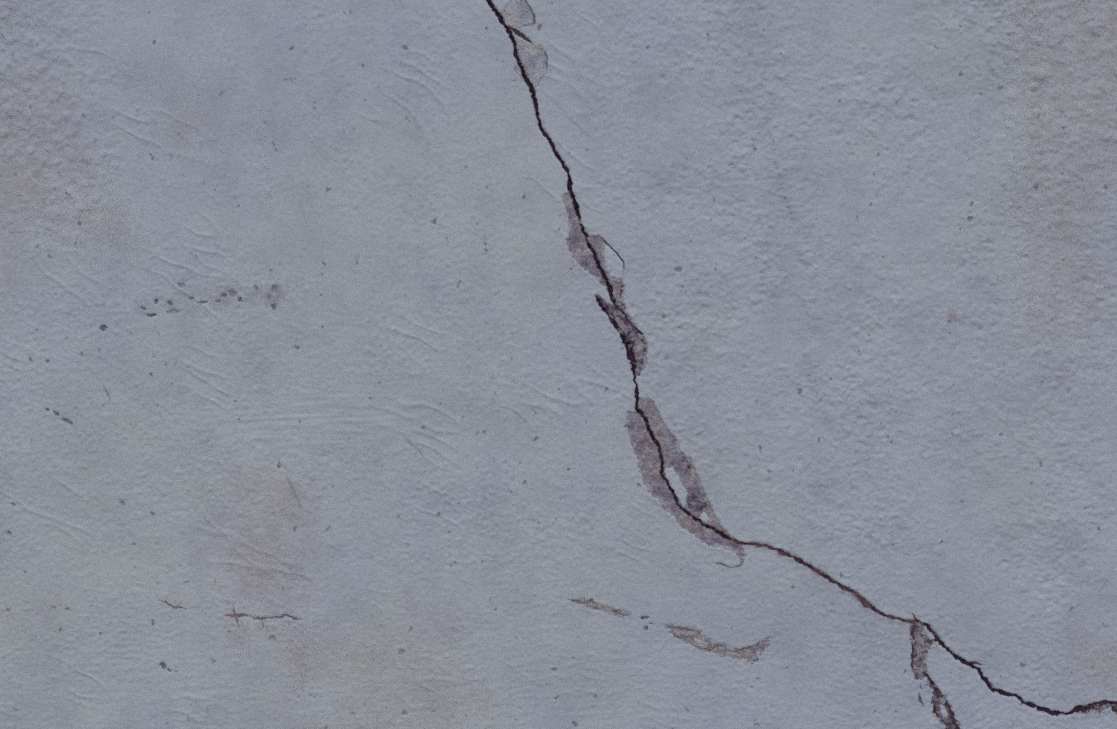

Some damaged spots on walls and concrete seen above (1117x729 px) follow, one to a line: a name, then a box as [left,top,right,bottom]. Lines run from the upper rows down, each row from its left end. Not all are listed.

peeling [500,0,548,89]
flaking render [563,193,648,376]
crack [486,0,1117,729]
flaking render [626,398,746,568]
peeling [569,598,774,665]